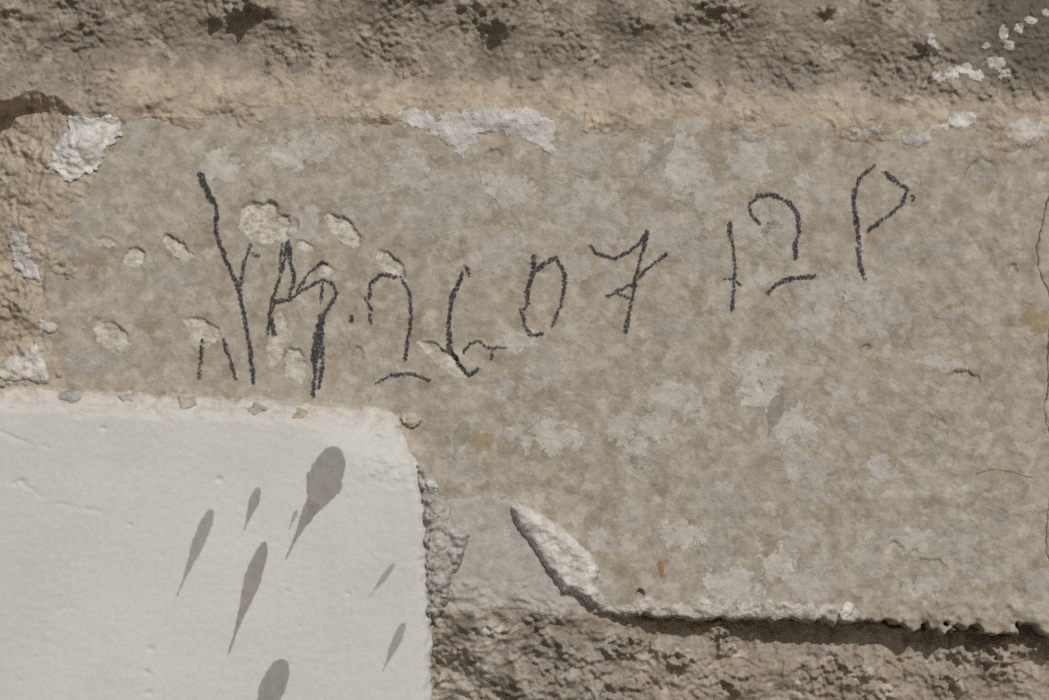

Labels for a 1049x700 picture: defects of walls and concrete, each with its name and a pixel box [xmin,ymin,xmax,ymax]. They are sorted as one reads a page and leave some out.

damp [48,114,123,186]
crack [1036,197,1049,292]
crack [1041,329,1049,431]
damp [181,510,213,585]
damp [245,487,261,527]
damp [286,446,345,558]
damp [228,542,268,653]
damp [257,659,289,700]